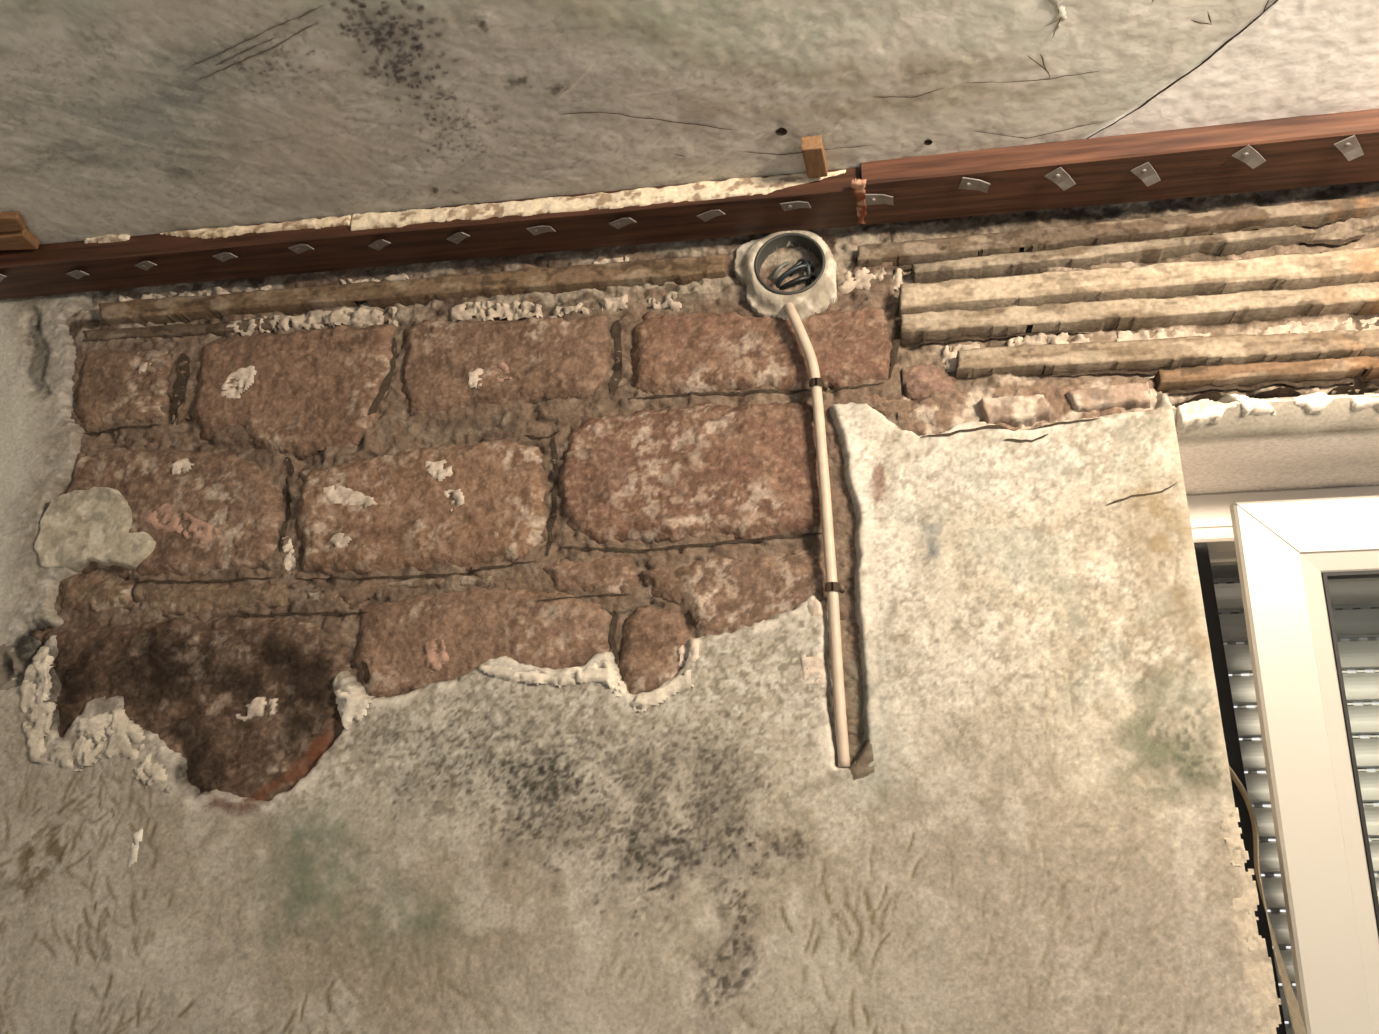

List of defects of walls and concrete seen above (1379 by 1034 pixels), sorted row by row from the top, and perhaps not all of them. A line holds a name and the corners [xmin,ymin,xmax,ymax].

damp [341,0,449,152]
flaking render [0,181,1379,801]
damp [431,725,779,898]